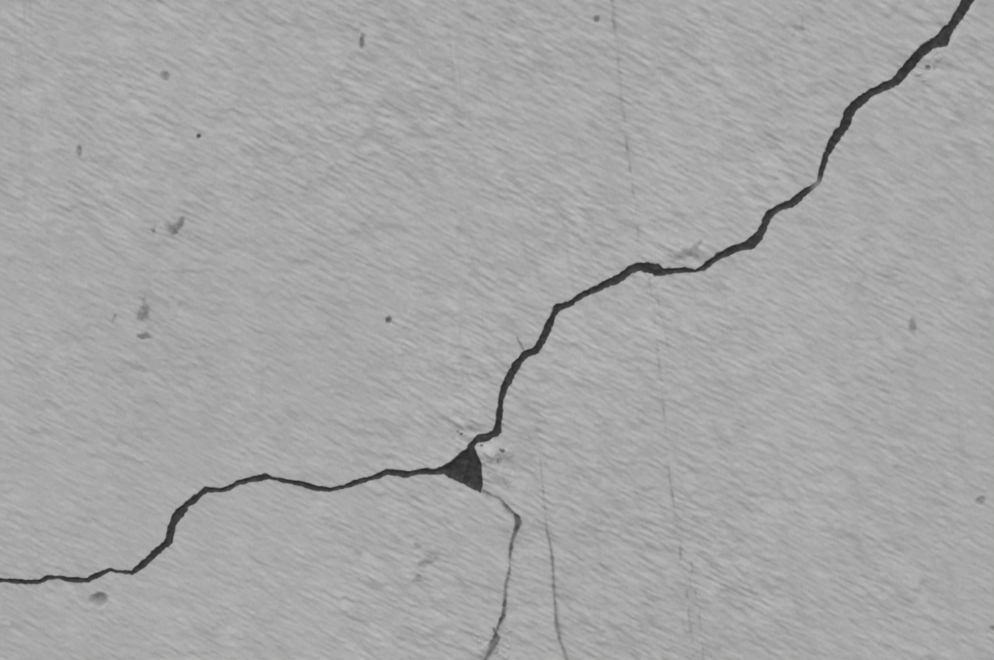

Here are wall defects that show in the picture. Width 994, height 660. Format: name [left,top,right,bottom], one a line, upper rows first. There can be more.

crack [466,0,976,447]
crack [0,465,443,586]
crack [481,411,571,660]